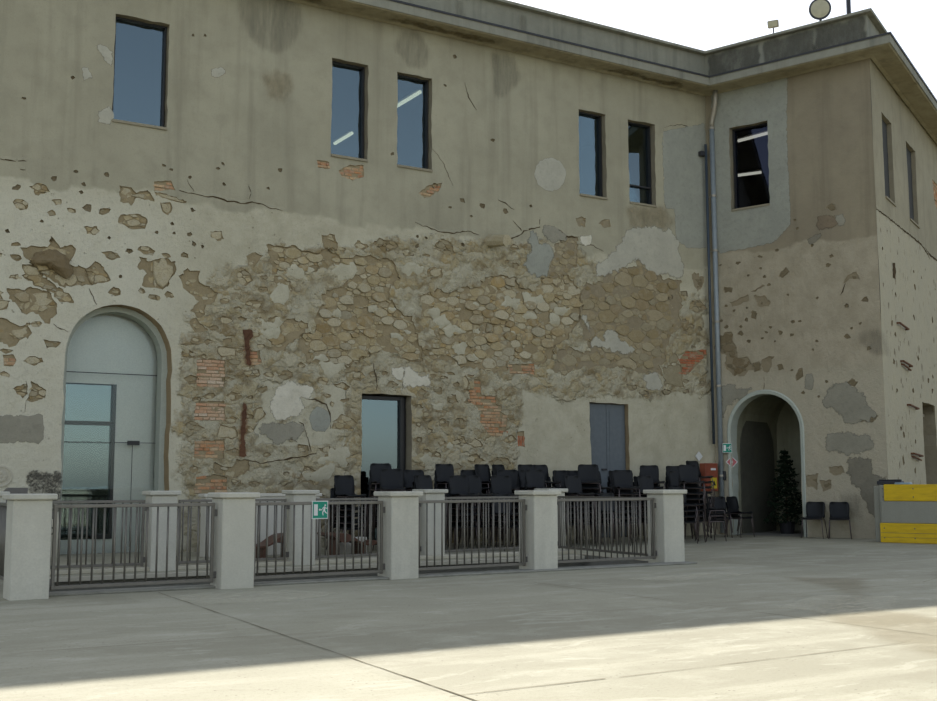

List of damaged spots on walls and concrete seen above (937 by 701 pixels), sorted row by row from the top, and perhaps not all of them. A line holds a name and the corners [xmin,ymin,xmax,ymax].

flaking render [12,164,196,234]
crack [179,179,283,211]
flaking render [317,160,364,180]
flaking render [419,183,442,198]
crack [876,207,937,261]
flaking render [0,217,803,494]